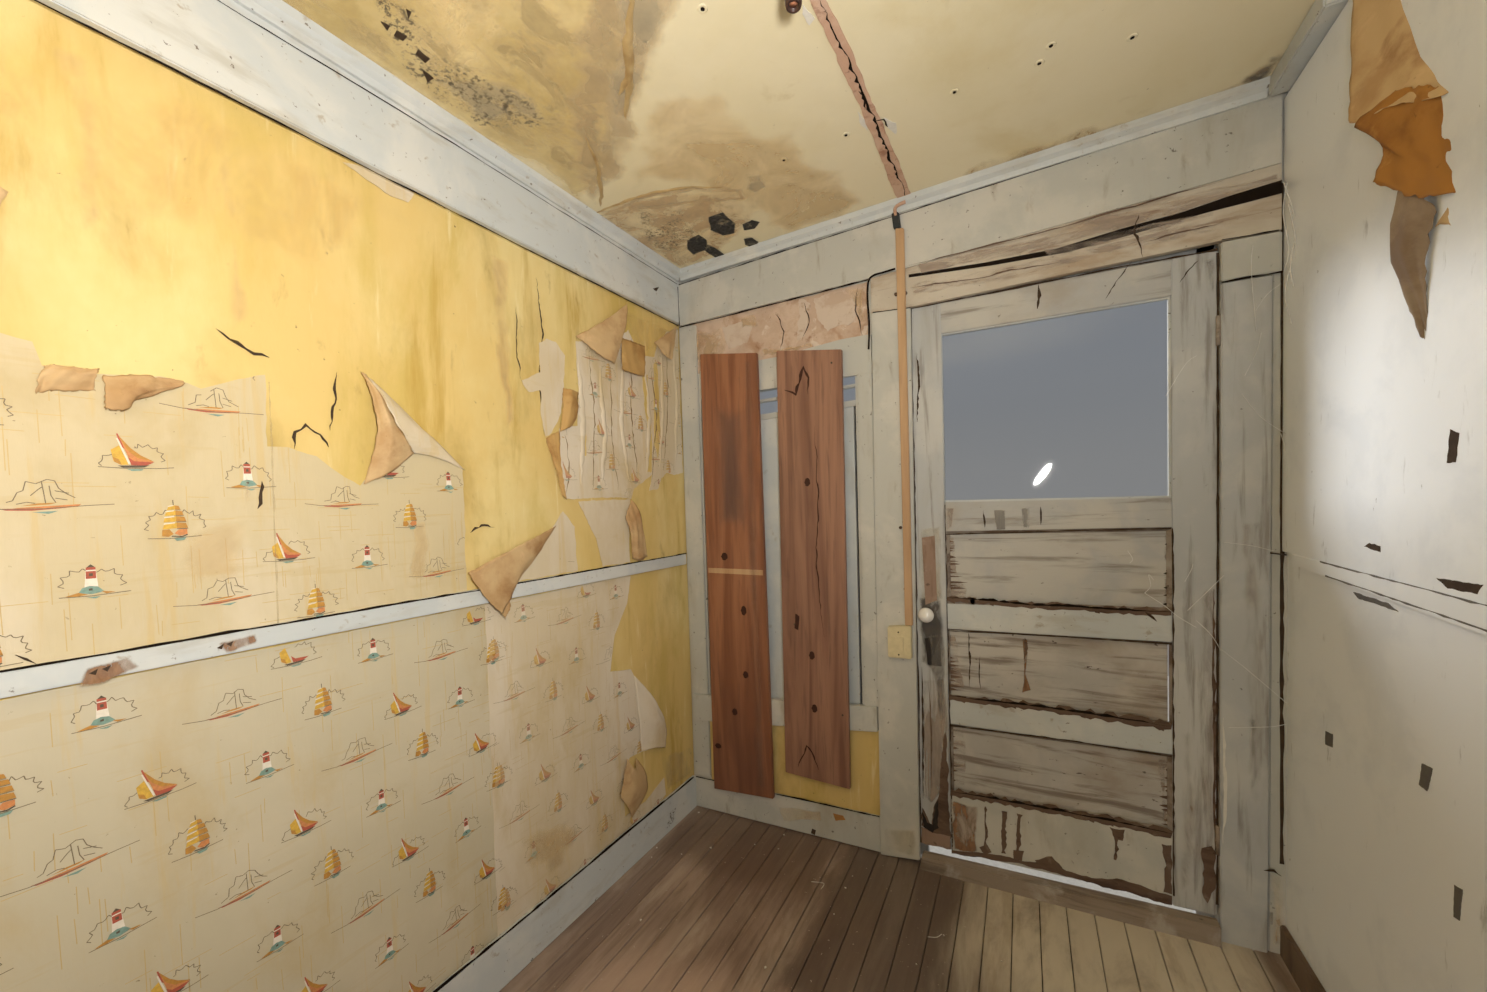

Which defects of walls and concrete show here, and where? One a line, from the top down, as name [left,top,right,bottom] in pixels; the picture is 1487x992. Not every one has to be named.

crack [34,0,1282,399]
water stain [597,186,760,263]
flaking render [693,282,868,374]
peeling [35,364,185,411]
peeling [361,372,464,484]
peeling [546,388,579,499]
peeling [626,499,647,561]
peeling [621,676,667,818]